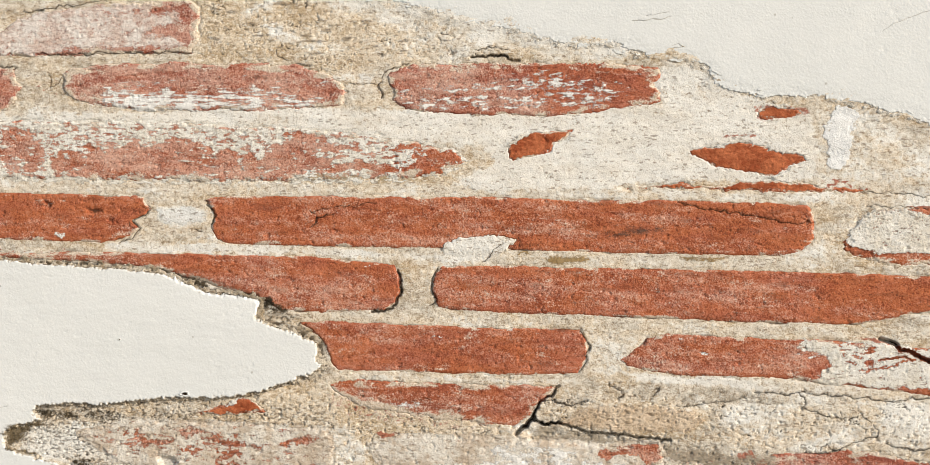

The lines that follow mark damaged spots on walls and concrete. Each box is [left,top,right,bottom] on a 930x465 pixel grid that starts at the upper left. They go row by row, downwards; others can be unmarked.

peeling [0,3,186,57]
peeling [400,69,629,110]
spalling [750,88,798,119]
peeling [0,80,469,185]
spalling [506,131,569,159]
spalling [691,138,823,192]
peeling [846,208,930,255]
peeling [0,255,336,465]
peeling [797,337,930,390]
peeling [368,432,670,465]
crack [517,390,670,441]
crack [787,391,930,454]